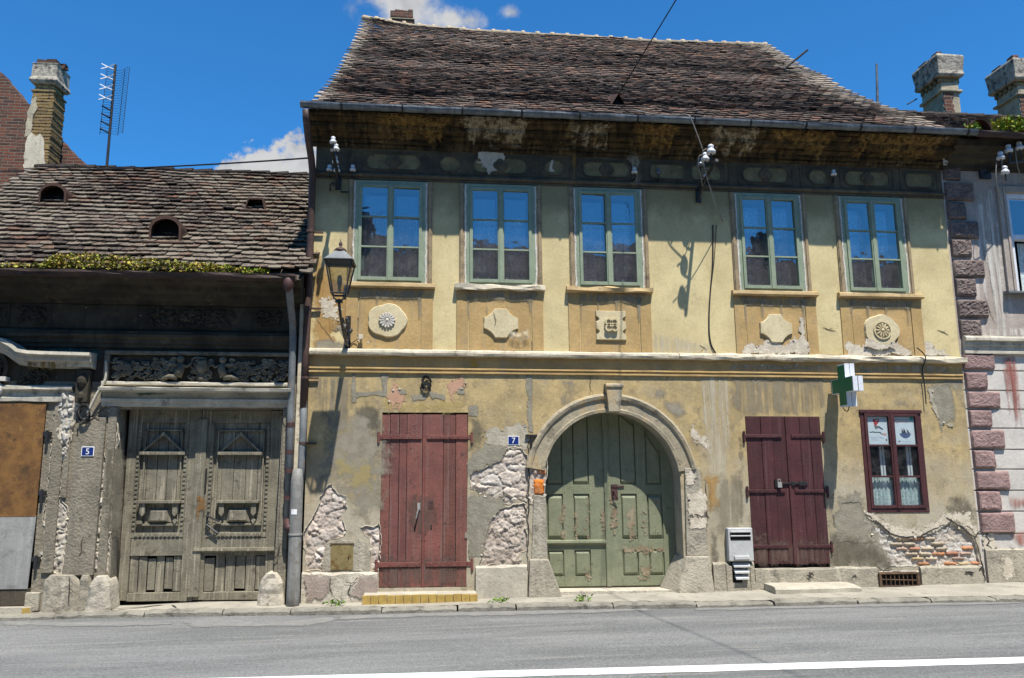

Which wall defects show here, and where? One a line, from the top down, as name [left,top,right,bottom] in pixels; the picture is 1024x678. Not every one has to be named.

peeling [476,152,505,175]
peeling [731,317,830,370]
peeling [845,339,951,373]
spalling [39,391,80,574]
flaking render [303,410,387,601]
spalling [469,423,548,566]
peeling [685,470,708,529]
spalling [827,490,998,568]